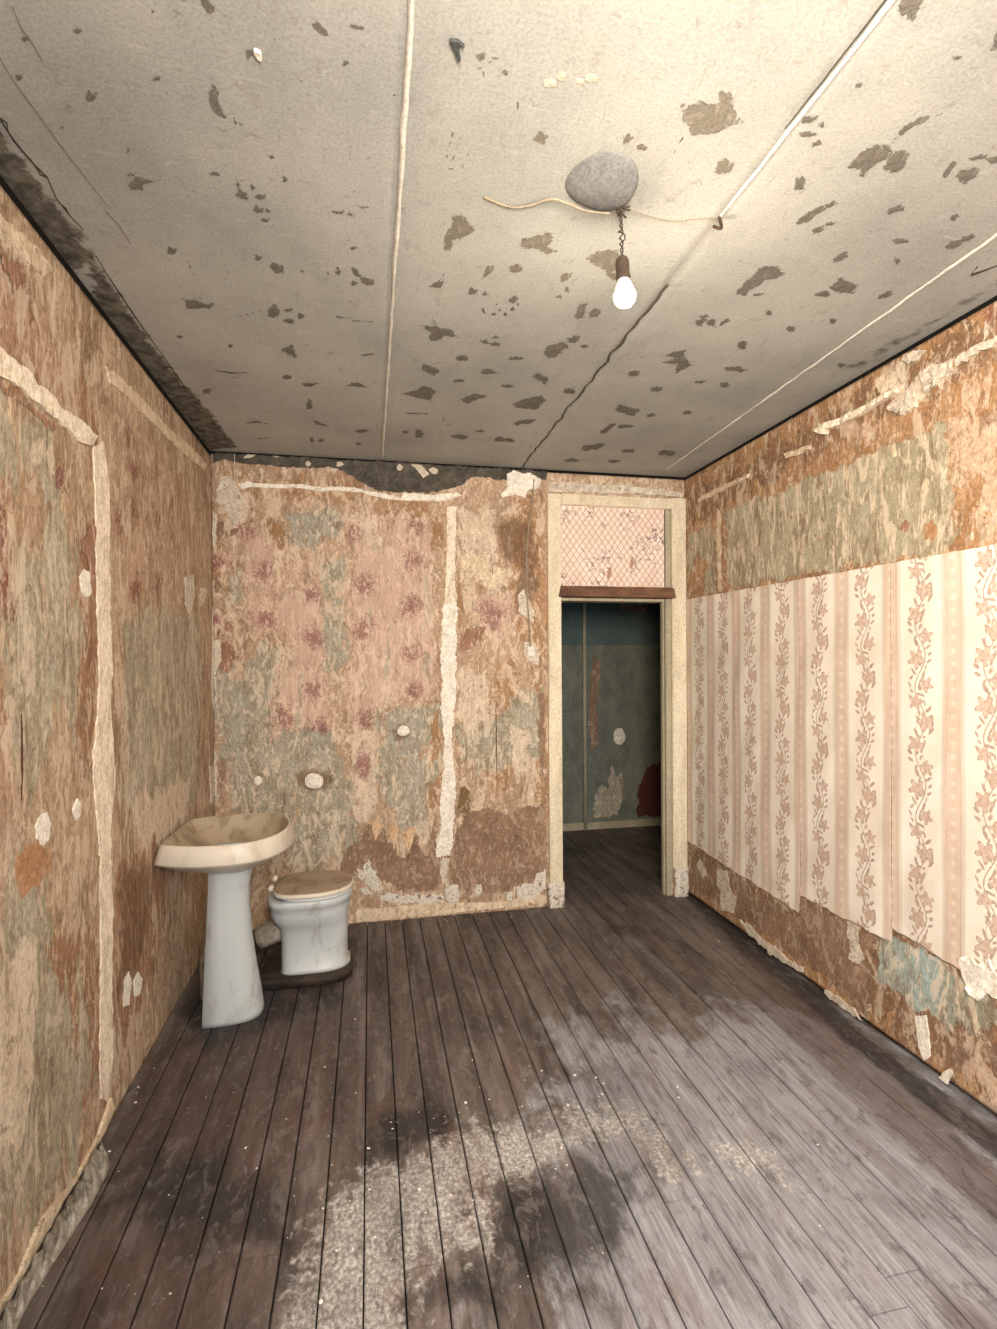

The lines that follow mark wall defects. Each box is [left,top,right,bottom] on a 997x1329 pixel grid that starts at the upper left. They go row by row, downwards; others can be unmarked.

crack [12,6,43,62]
peeling [898,0,923,20]
peeling [673,91,743,153]
peeling [848,112,943,177]
crack [0,58,194,398]
peeling [736,266,784,296]
spalling [784,336,997,458]
flaking render [0,131,750,923]
flaking render [0,347,143,1315]
flaking render [690,850,880,1021]
spalling [957,956,997,1001]
spalling [914,1015,931,1060]